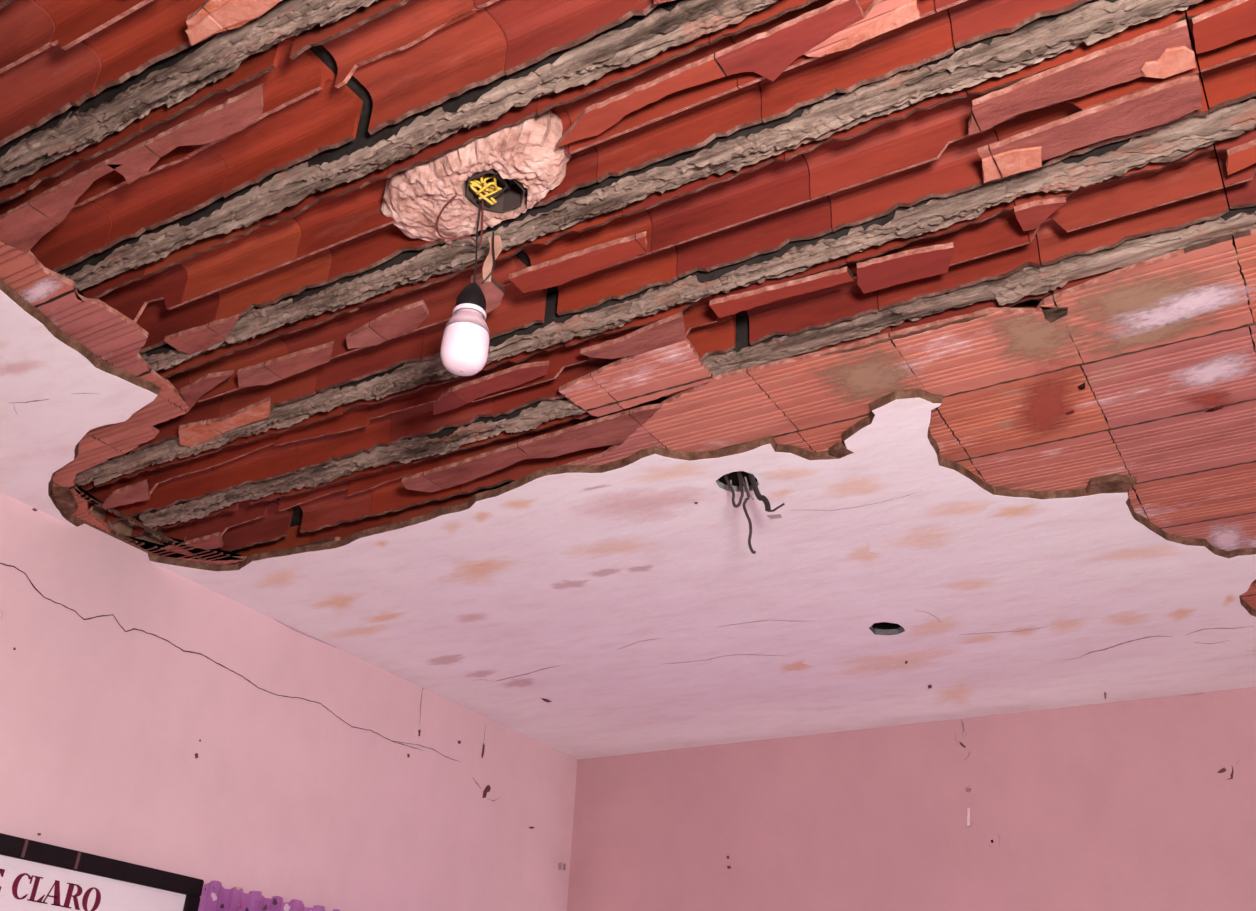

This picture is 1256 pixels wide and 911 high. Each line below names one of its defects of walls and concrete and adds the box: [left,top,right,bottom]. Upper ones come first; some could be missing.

peeling [185,0,282,46]
peeling [823,0,920,55]
peeling [1141,46,1196,79]
peeling [982,146,1042,183]
flaking render [0,277,161,396]
flaking render [48,471,84,527]
flaking render [148,389,1256,571]
flaking render [1239,595,1256,617]